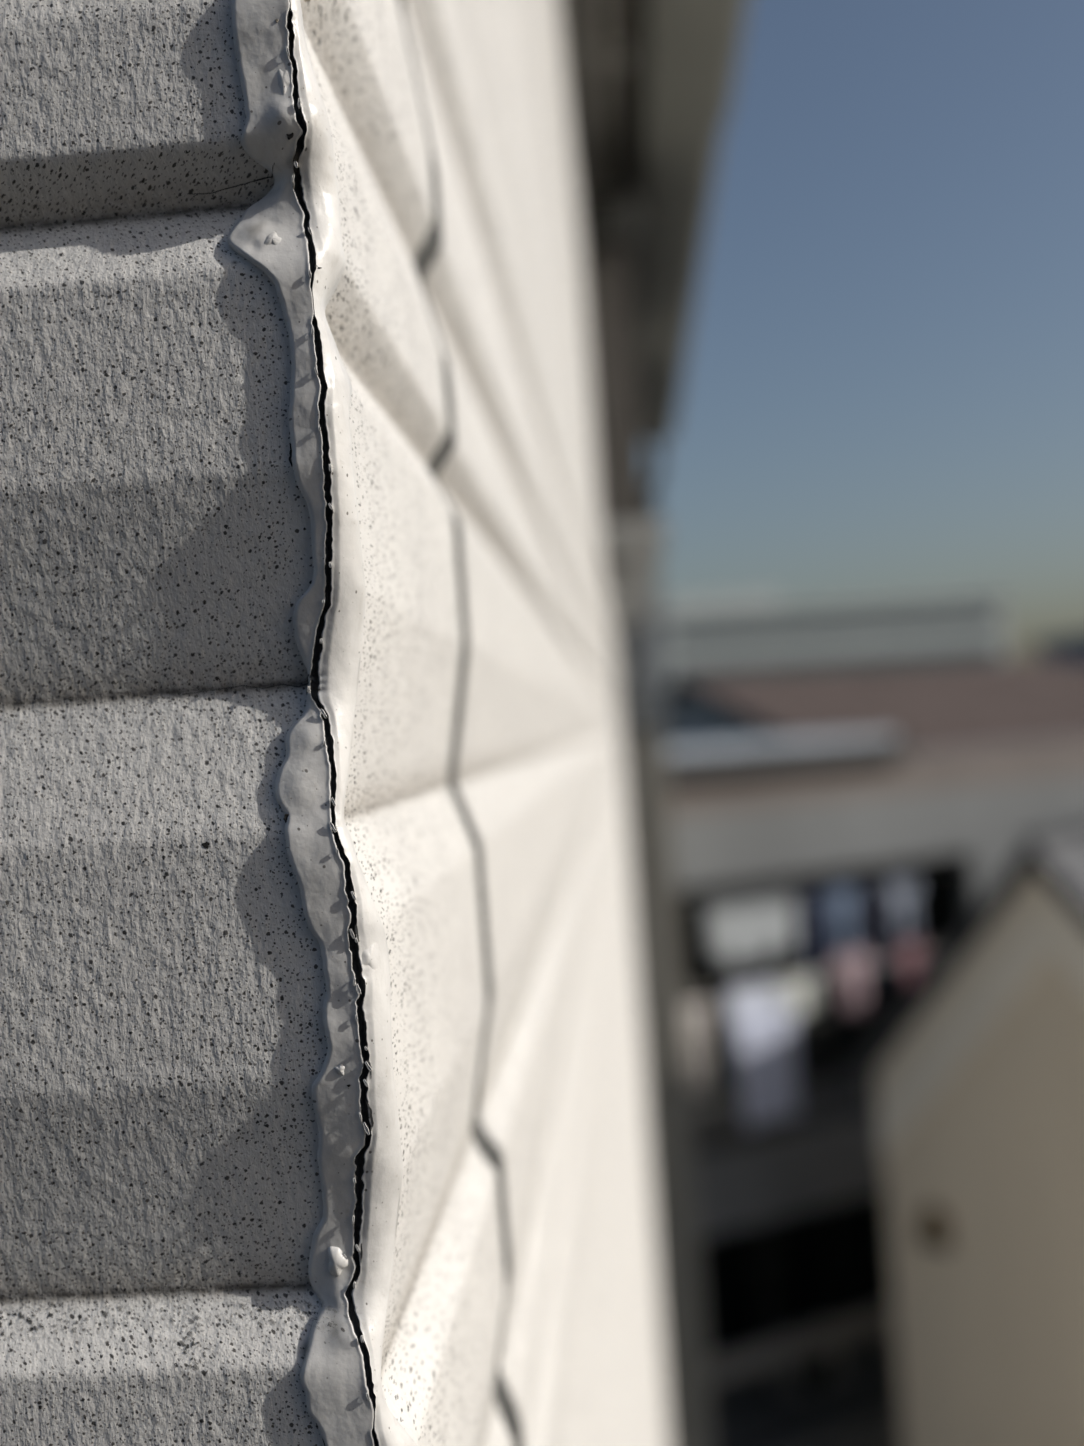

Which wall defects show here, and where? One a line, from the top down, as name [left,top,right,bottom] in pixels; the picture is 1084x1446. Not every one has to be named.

crack [182,12,379,1446]